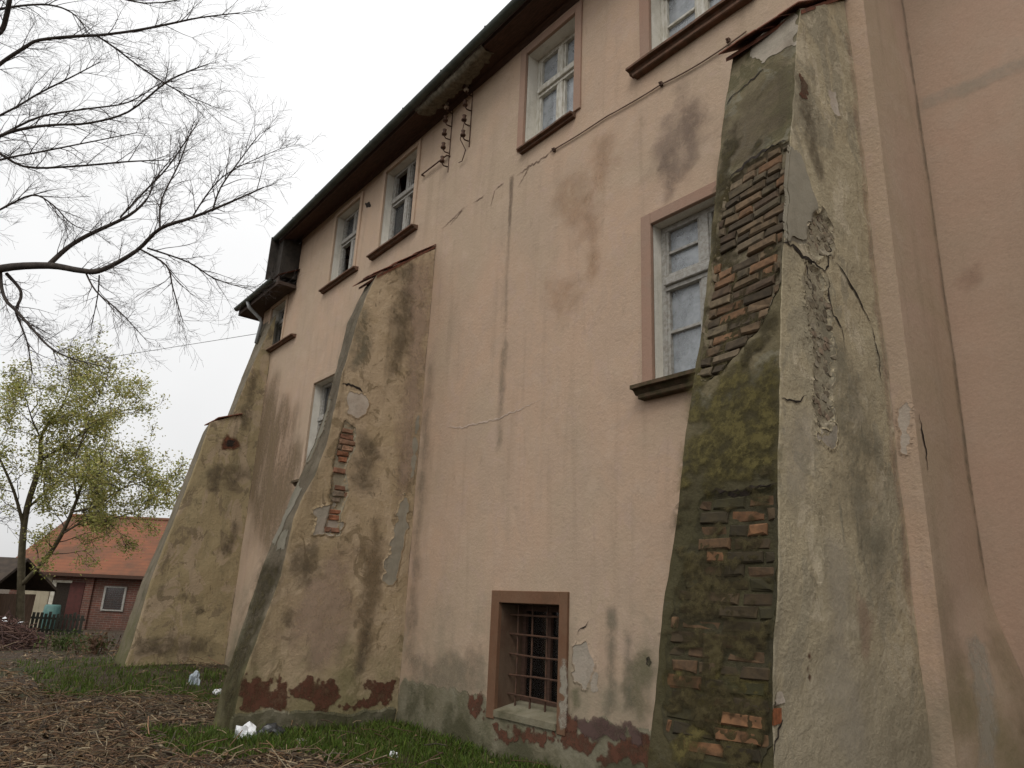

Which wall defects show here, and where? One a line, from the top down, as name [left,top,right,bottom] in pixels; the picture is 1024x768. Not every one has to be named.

peeling [750,13,798,63]
crack [444,152,550,227]
flaking render [697,140,790,381]
spalling [798,203,840,454]
crack [783,241,881,378]
spalling [222,436,240,450]
peeling [272,481,302,551]
flaking render [306,389,371,538]
flaking render [661,485,785,768]
peeling [239,673,396,713]
peeling [468,638,650,768]